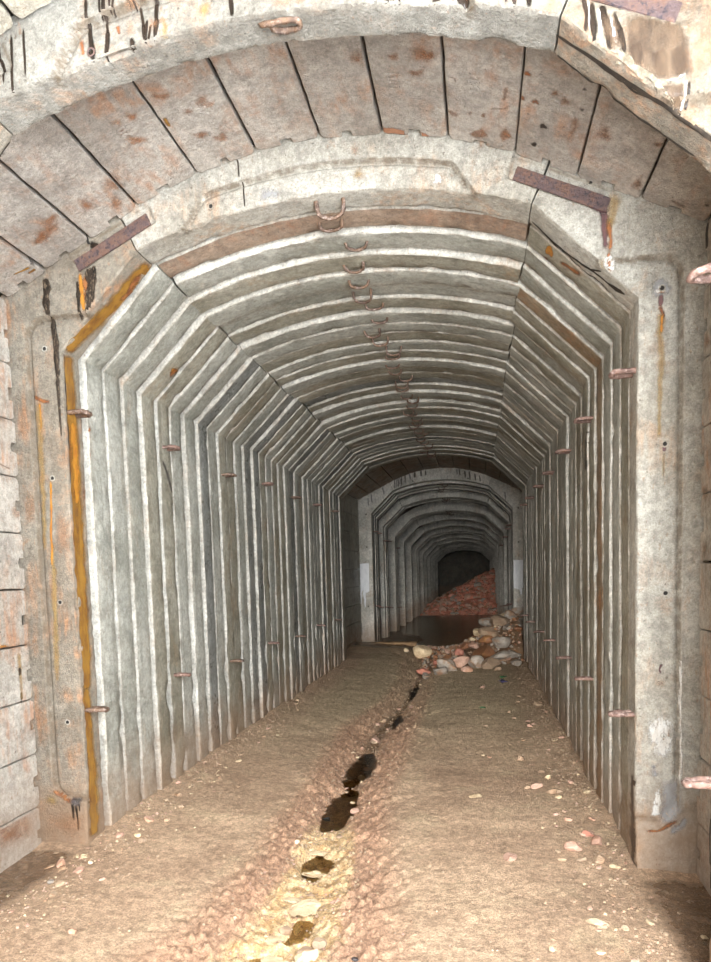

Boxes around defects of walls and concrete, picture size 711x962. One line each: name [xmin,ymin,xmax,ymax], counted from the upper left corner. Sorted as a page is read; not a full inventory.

water stain [80,0,120,62]
water stain [128,0,159,53]
corrosion [589,198,617,250]
corrosion [654,280,670,434]
corrosion [35,396,58,672]
corrosion [64,263,150,836]